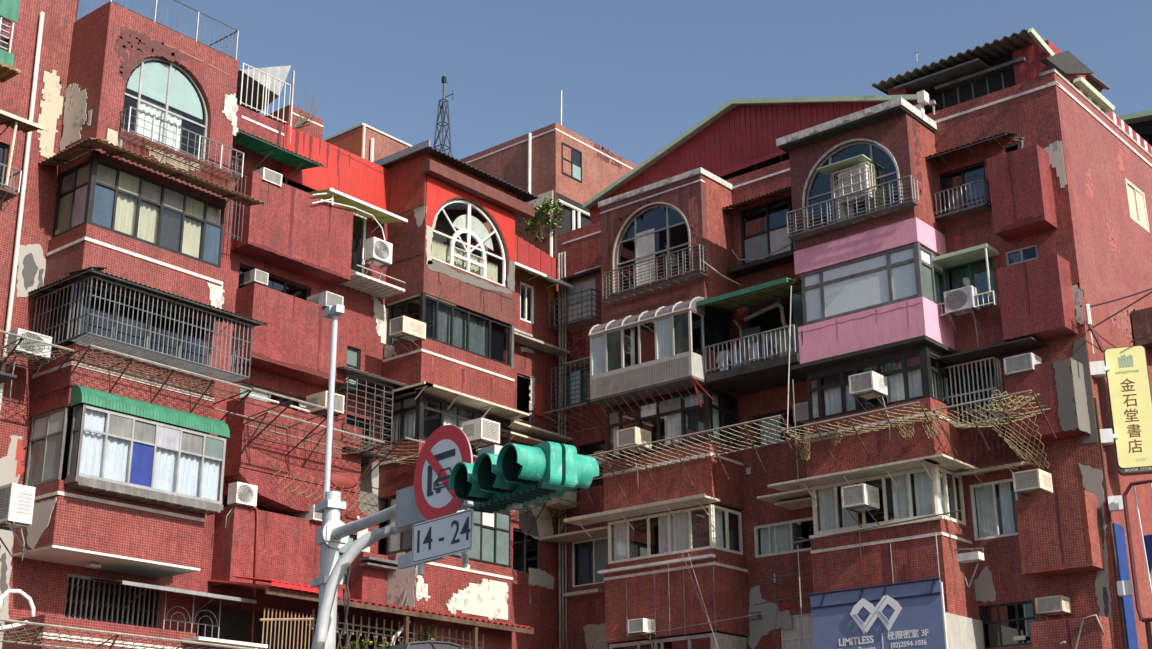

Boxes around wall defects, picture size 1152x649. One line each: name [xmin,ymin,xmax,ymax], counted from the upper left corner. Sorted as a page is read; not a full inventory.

peeling [36,69,93,159]
peeling [105,126,124,148]
peeling [221,93,239,137]
peeling [1044,141,1067,188]
peeling [16,244,46,297]
peeling [1053,283,1098,444]
peeling [375,550,431,614]
peeling [445,564,509,622]